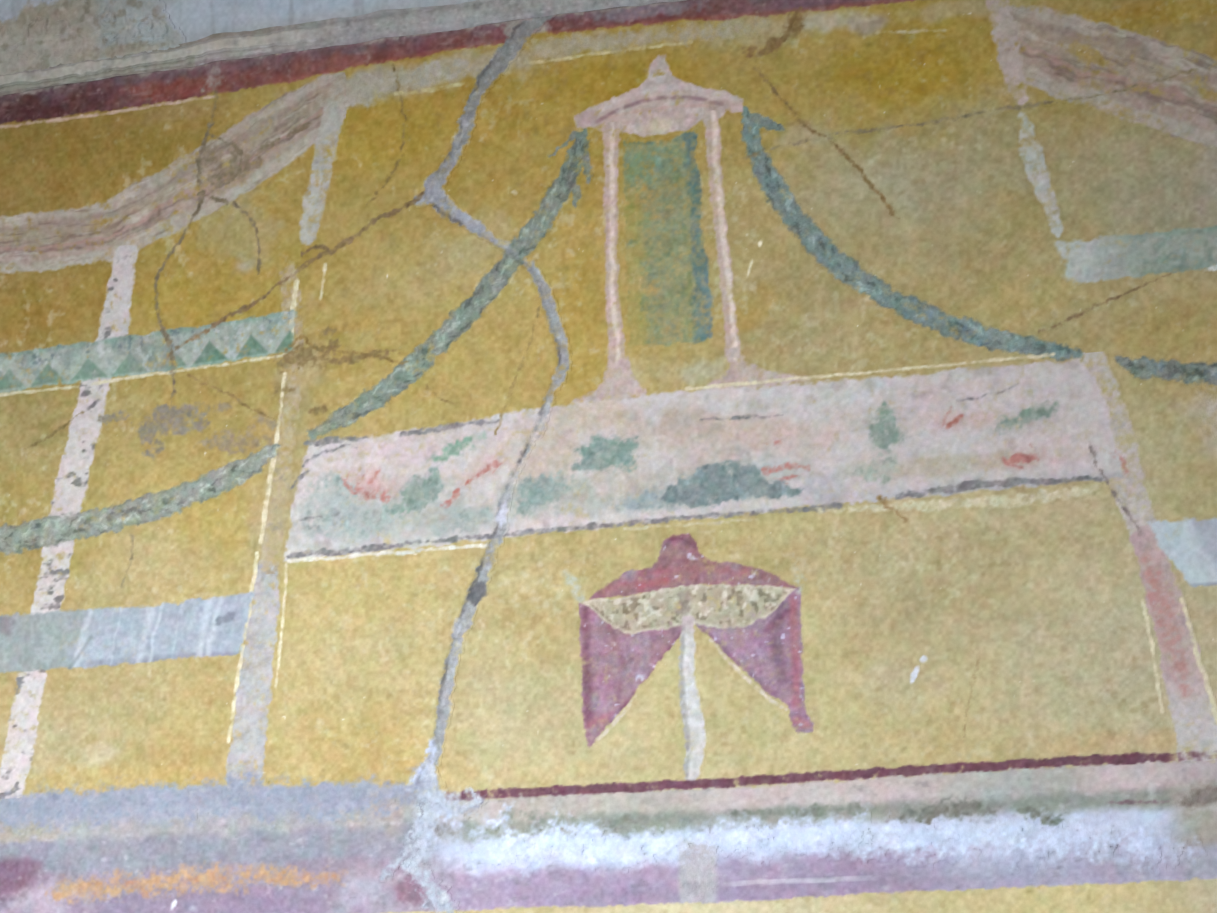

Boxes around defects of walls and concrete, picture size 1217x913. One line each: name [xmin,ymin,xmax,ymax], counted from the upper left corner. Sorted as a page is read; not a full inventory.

crack [733,34,1199,221]
crack [152,14,572,913]
leakage [410,787,1207,882]